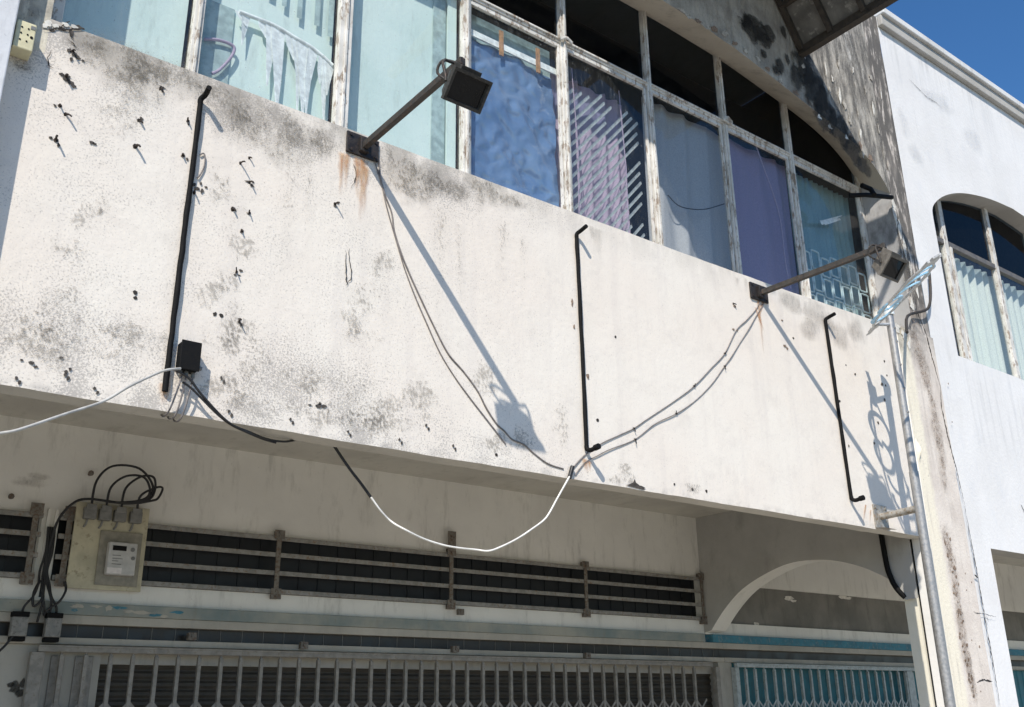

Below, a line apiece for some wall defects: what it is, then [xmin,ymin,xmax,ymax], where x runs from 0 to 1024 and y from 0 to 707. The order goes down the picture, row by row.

mould [741,14,871,177]